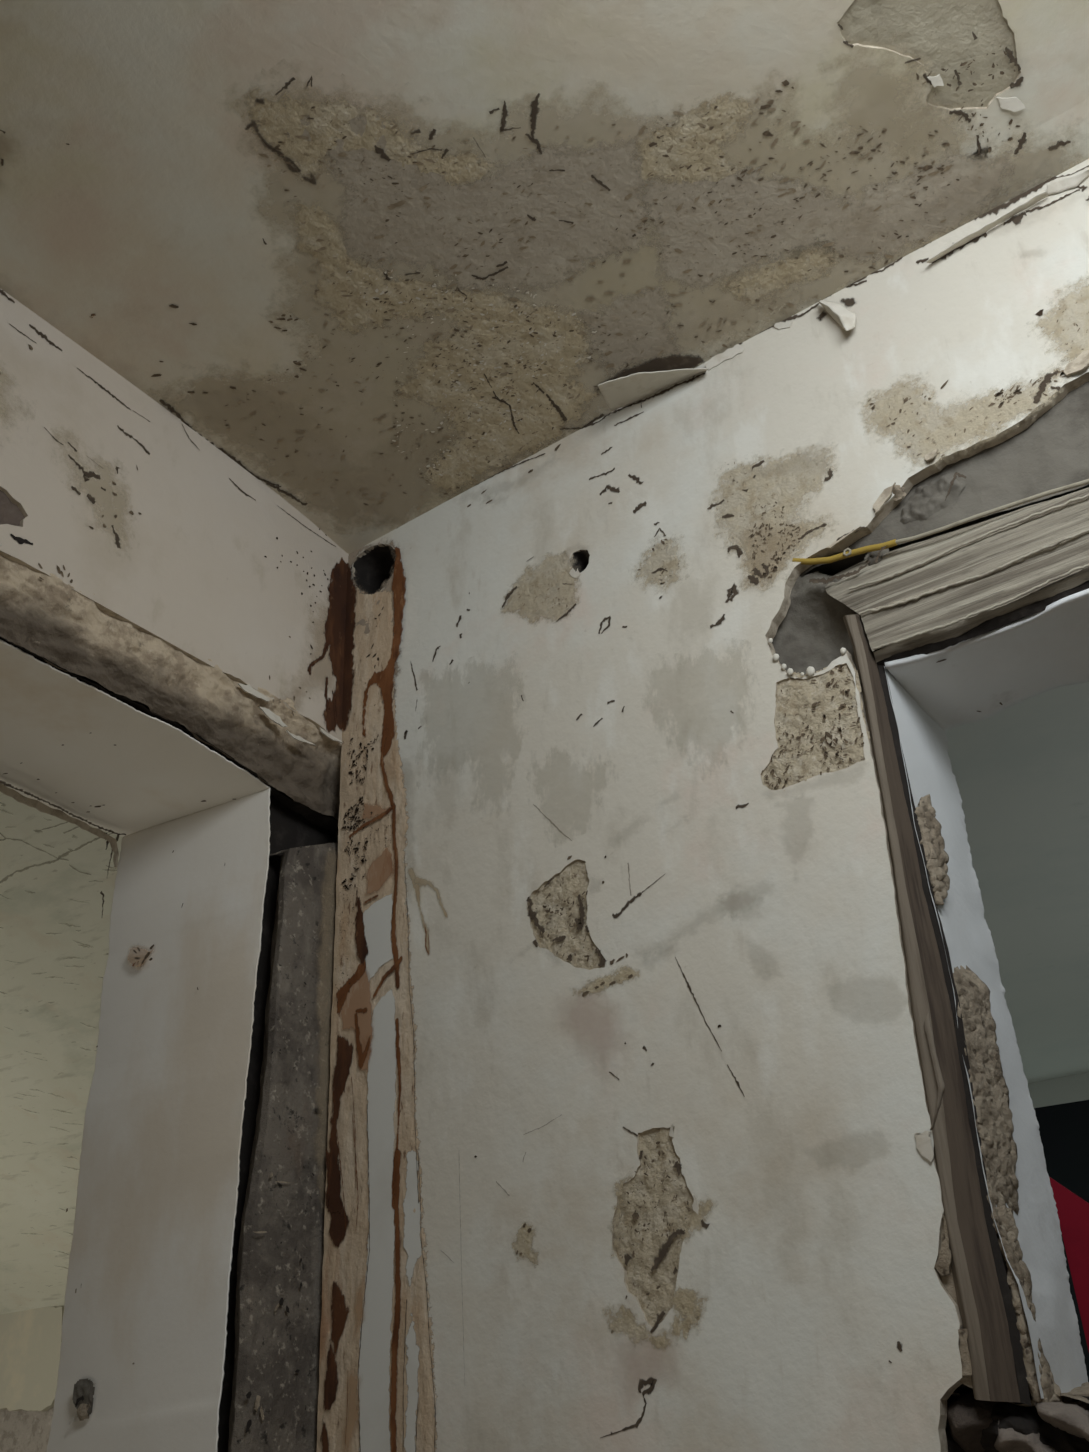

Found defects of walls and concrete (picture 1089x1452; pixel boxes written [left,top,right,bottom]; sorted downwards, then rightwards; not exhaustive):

flaking render [989,350,1089,408]
spalling [0,490,33,545]
spalling [727,547,769,585]
flaking render [801,482,906,549]
spalling [761,571,870,791]
rust [308,547,406,1247]
spalling [526,855,639,997]
rust [390,1018,401,1452]
spalling [605,1124,713,1349]
flaking render [935,1213,958,1305]
rust [320,1281,362,1452]
spalling [945,1329,1089,1452]